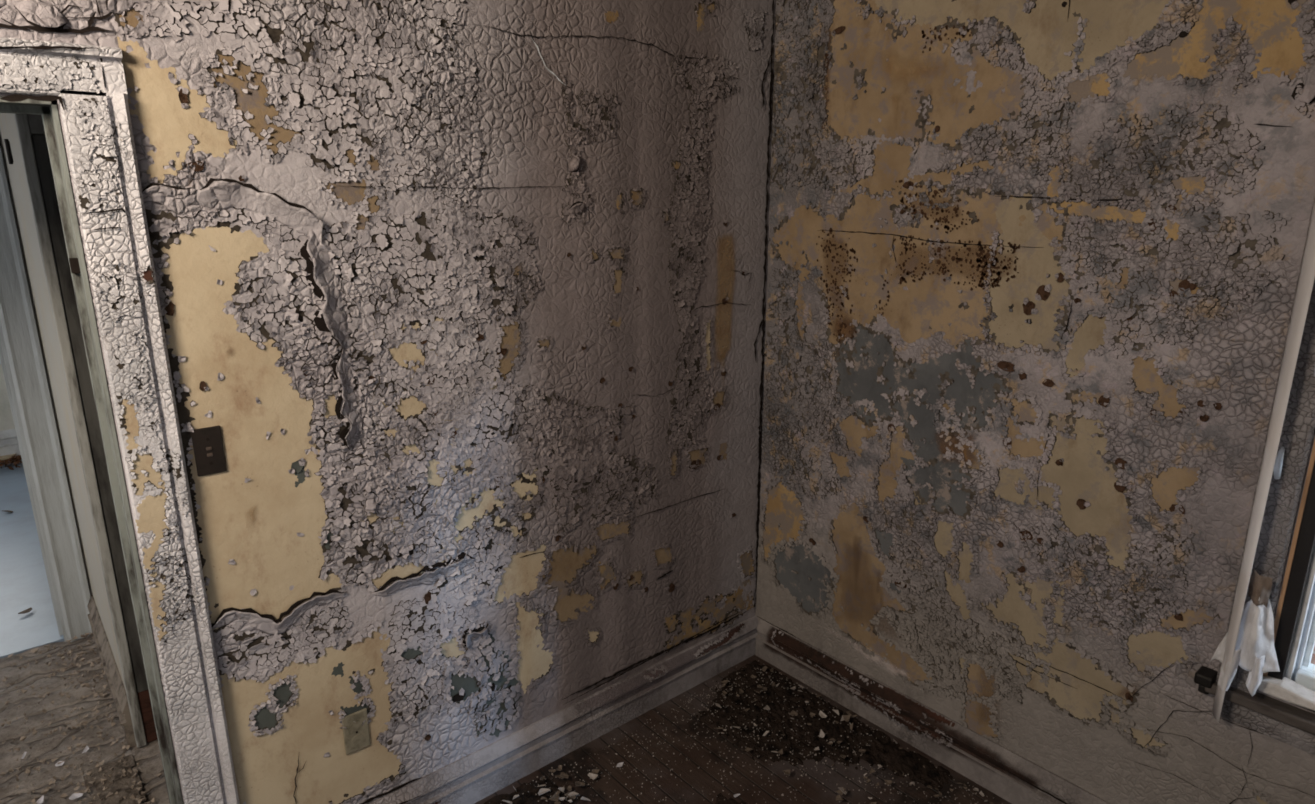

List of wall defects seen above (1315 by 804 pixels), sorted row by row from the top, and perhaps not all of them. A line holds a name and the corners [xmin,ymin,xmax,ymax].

water stain [922,25,972,53]
crack [353,183,561,191]
water stain [816,228,859,342]
water stain [878,180,1020,319]
peeling [0,0,658,804]
peeling [644,0,1315,757]
crack [1006,647,1314,804]